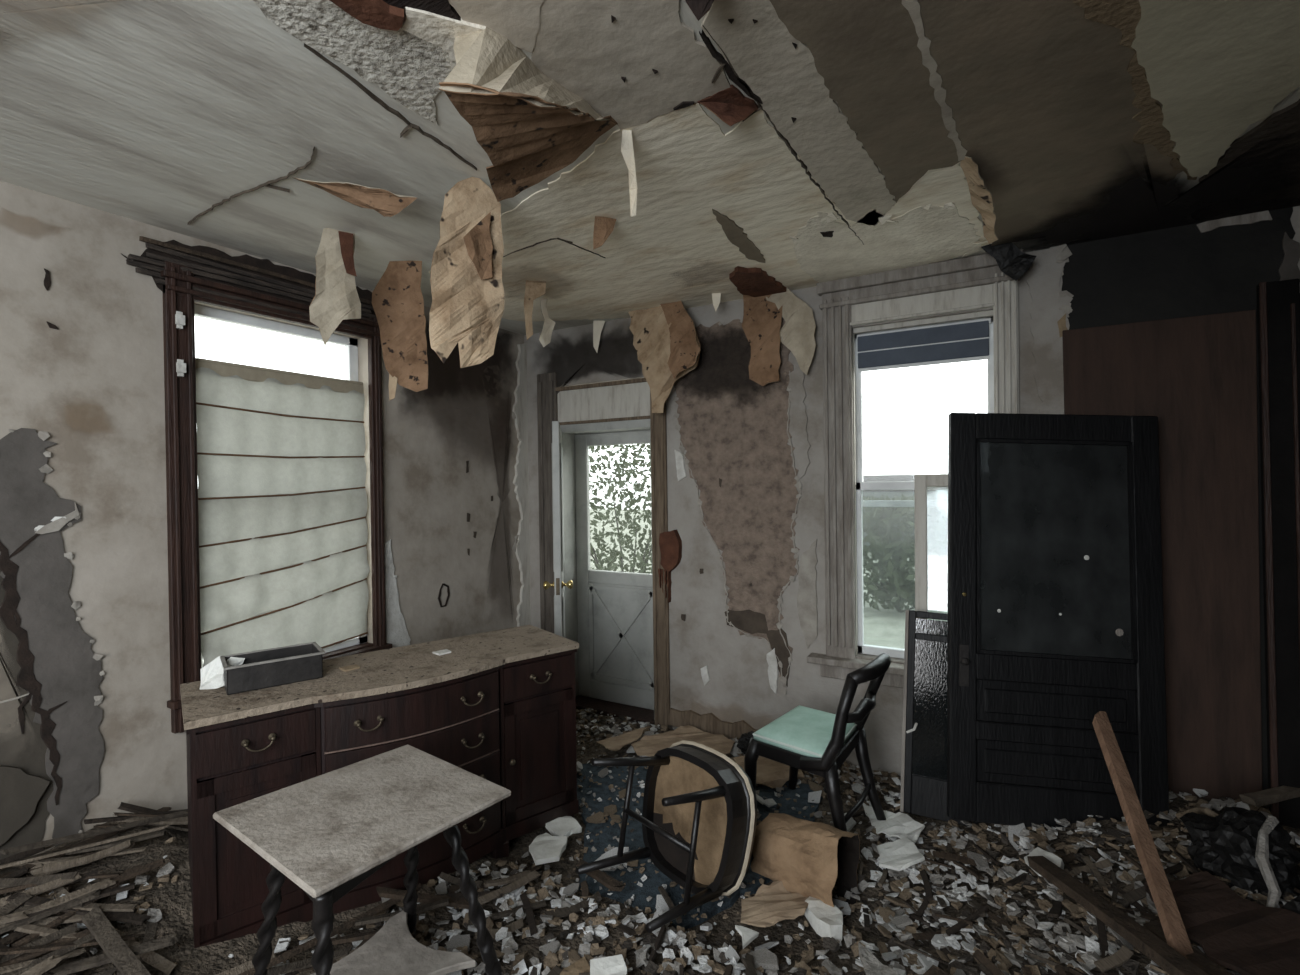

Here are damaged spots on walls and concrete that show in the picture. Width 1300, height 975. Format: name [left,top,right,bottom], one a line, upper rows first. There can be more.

crack [187,147,315,225]
peeling [253,0,451,126]
peeling [292,177,417,217]
crack [304,43,477,171]
peeling [501,0,1074,414]
flaking render [1199,99,1300,207]
flaking render [673,319,811,695]
crack [0,533,67,805]
peeling [0,428,105,860]